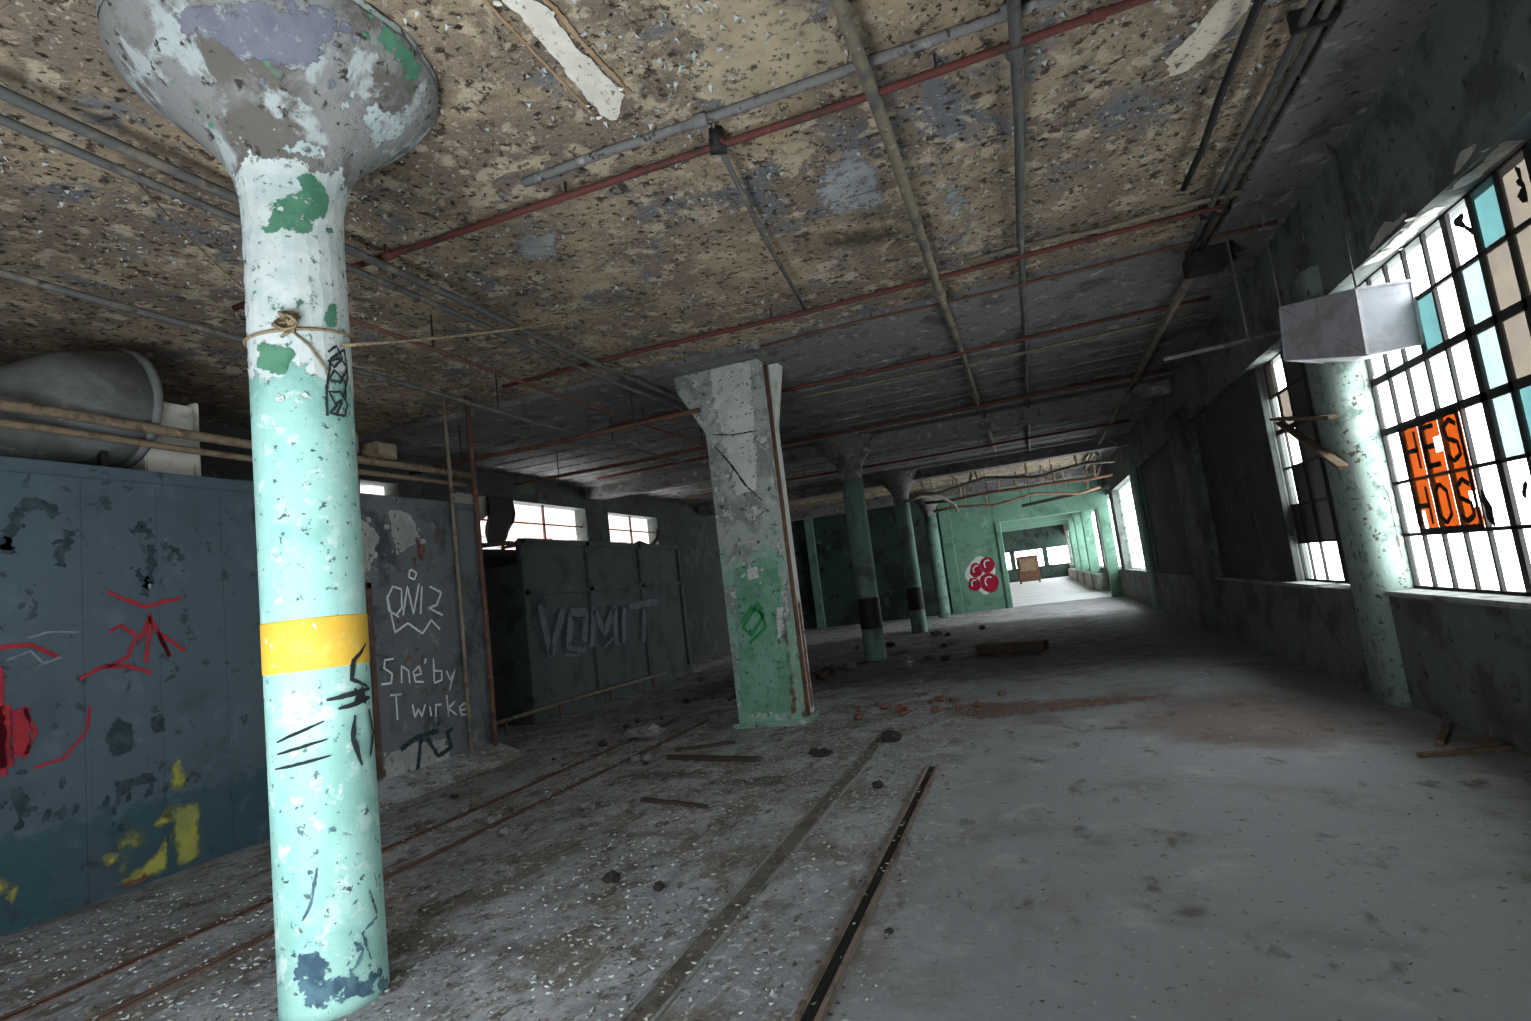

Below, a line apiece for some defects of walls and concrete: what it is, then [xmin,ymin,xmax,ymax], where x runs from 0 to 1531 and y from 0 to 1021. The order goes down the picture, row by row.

peeling [0,0,1299,501]
peeling [358,509,426,573]
peeling [727,554,800,719]
peeling [278,951,388,1009]